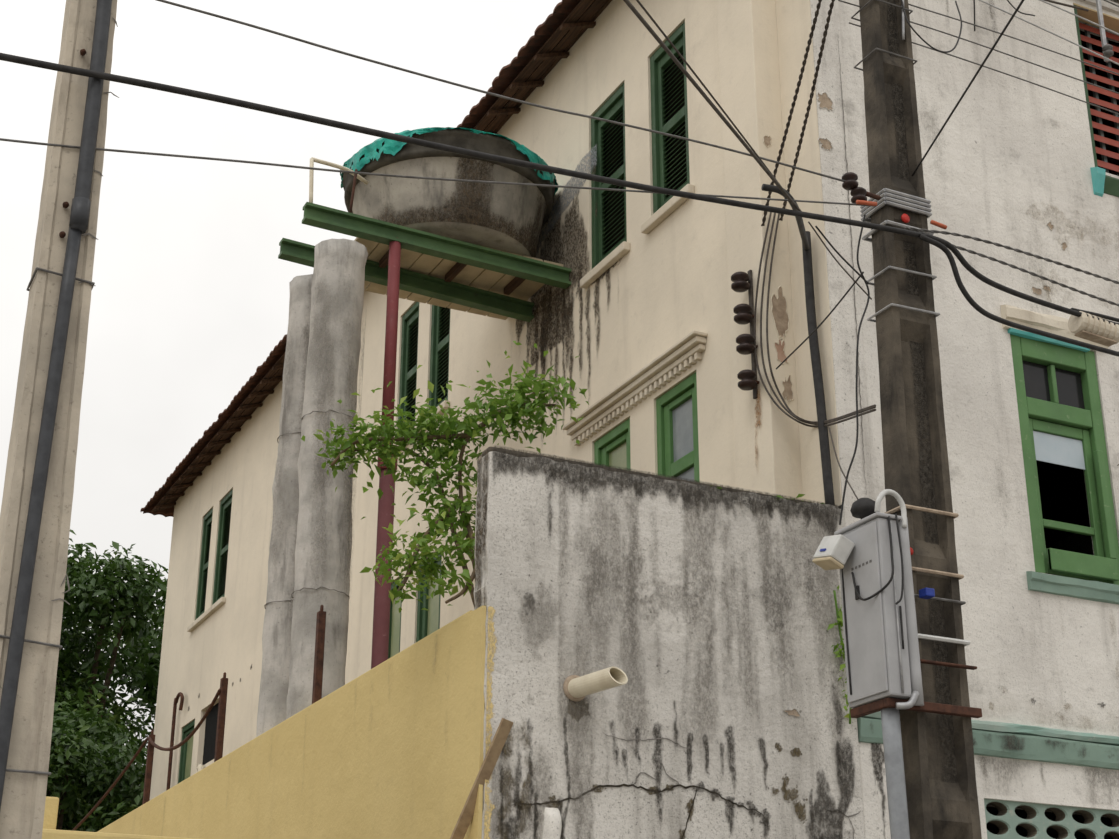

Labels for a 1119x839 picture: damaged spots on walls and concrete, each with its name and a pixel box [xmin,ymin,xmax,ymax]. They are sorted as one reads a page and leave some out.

leakage [378,158,617,416]
flaking render [771,286,793,404]
leakage [475,446,841,609]
leakage [524,582,555,646]
leakage [587,546,736,804]
leakage [492,693,590,839]
crack [510,731,770,839]
leakage [759,738,855,839]
leakage [871,743,886,826]